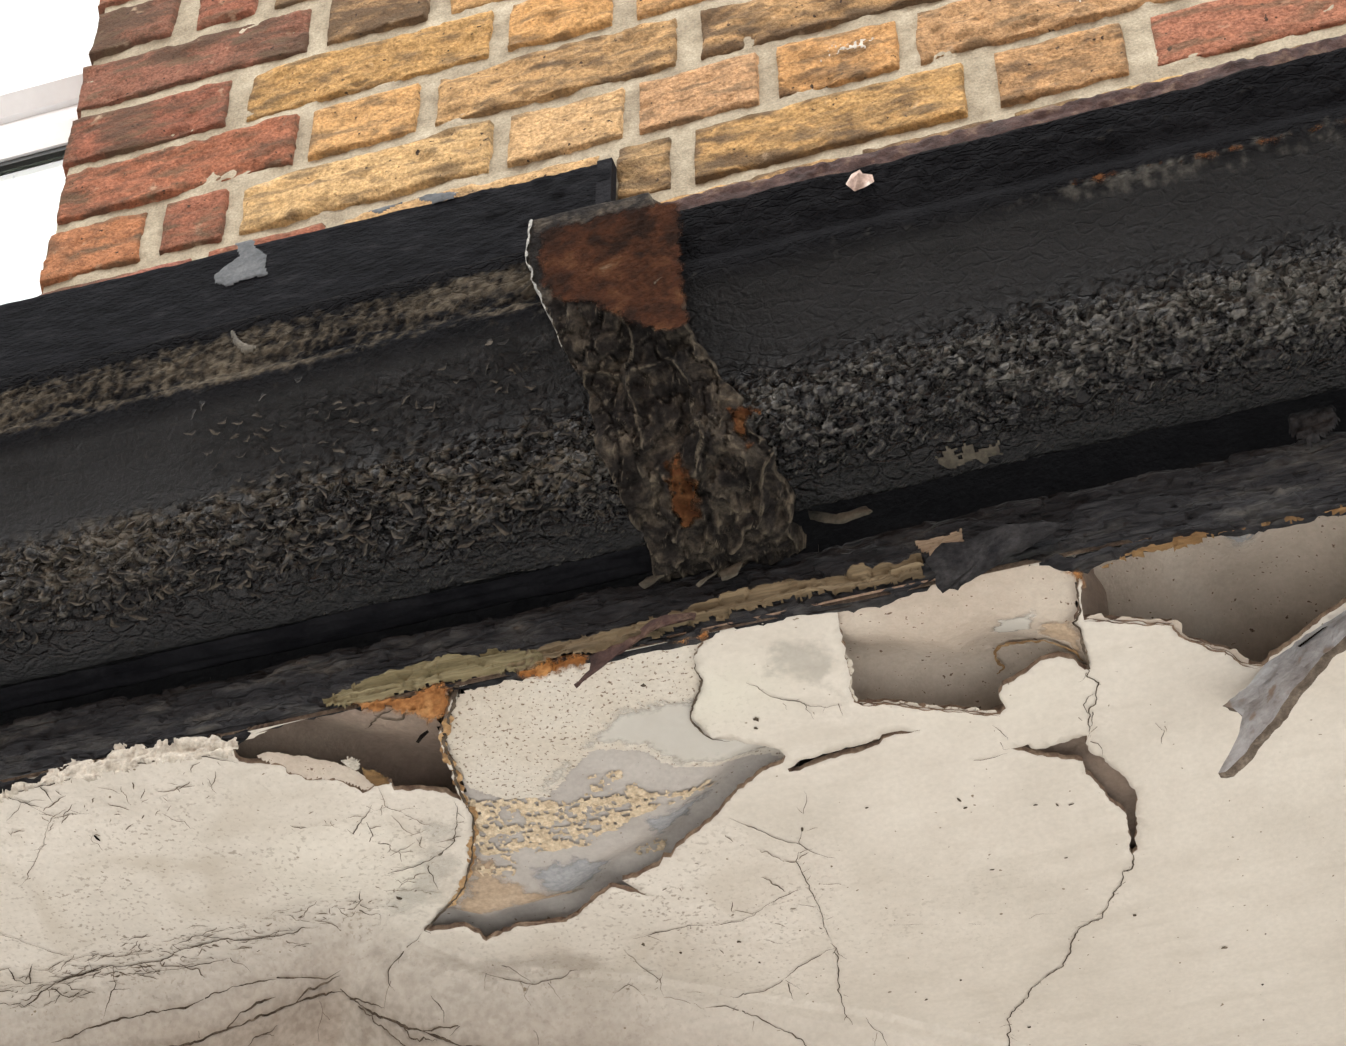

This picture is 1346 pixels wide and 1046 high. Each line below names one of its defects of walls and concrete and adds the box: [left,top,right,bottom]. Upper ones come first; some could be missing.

rust [536,202,689,331]
rust [664,454,701,528]
spalling [838,515,1346,778]
crack [8,755,233,887]
spalling [235,613,799,939]
spalling [1025,736,1137,850]
crack [0,792,472,1046]
crack [482,965,578,1045]
crack [1001,850,1135,1046]